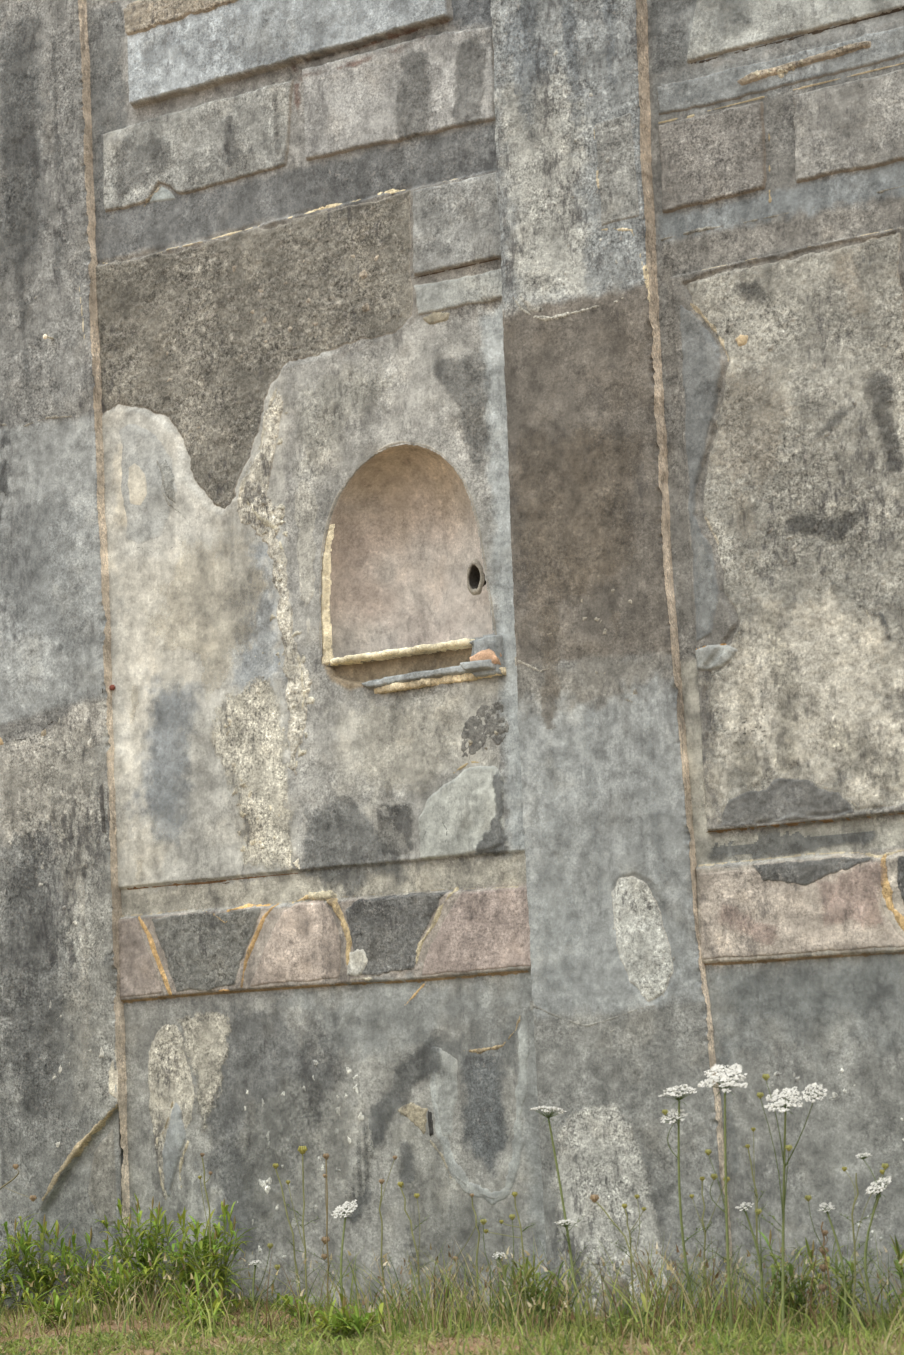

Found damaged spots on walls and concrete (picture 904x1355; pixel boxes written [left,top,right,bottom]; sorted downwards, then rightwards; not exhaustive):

peeling [79,186,450,870]
peeling [611,876,674,1002]